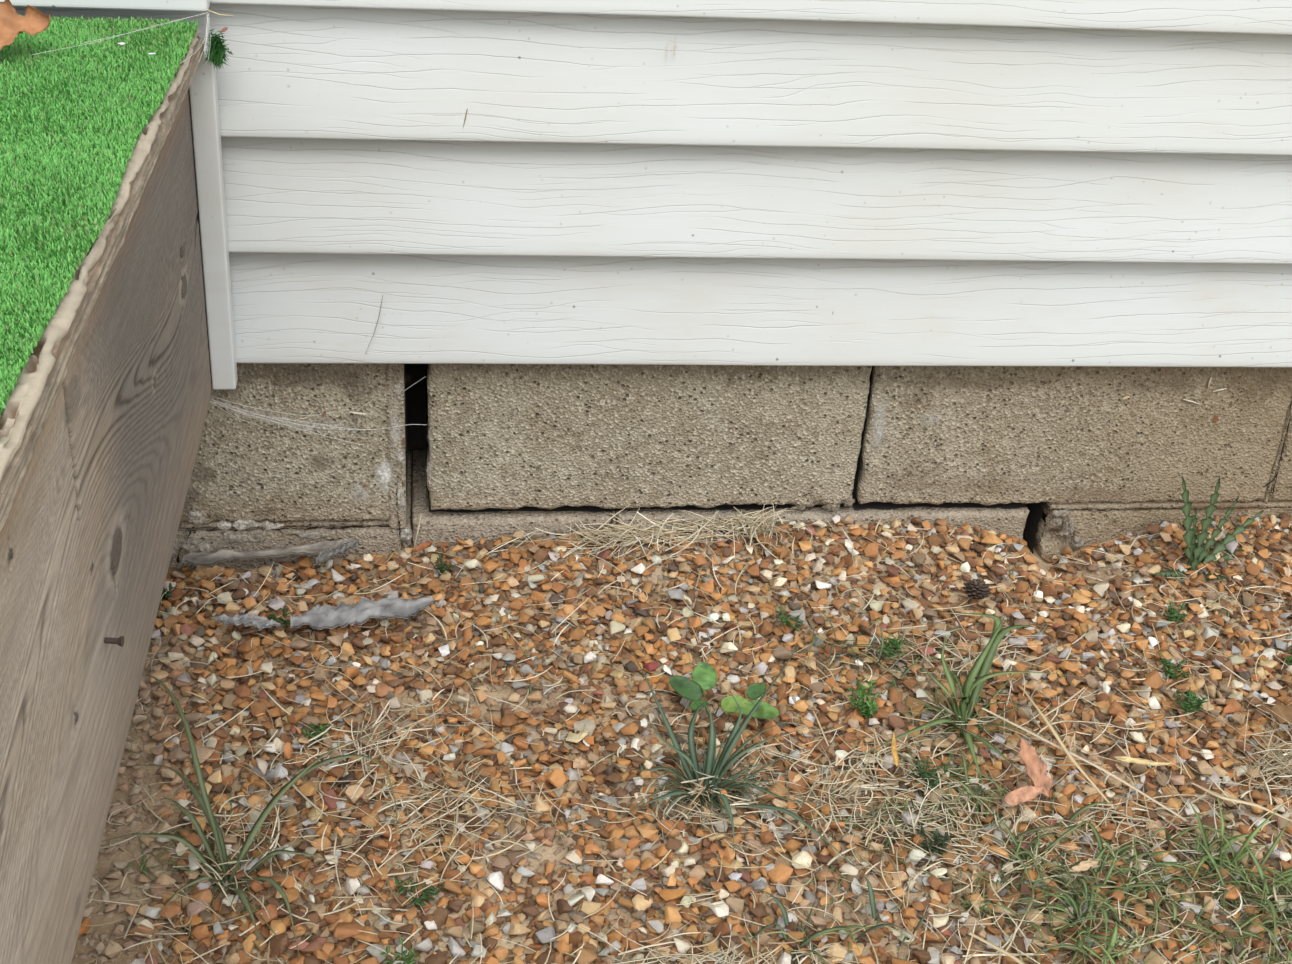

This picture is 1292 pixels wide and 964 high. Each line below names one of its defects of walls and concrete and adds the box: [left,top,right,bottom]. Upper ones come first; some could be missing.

crack [1055,402,1292,512]